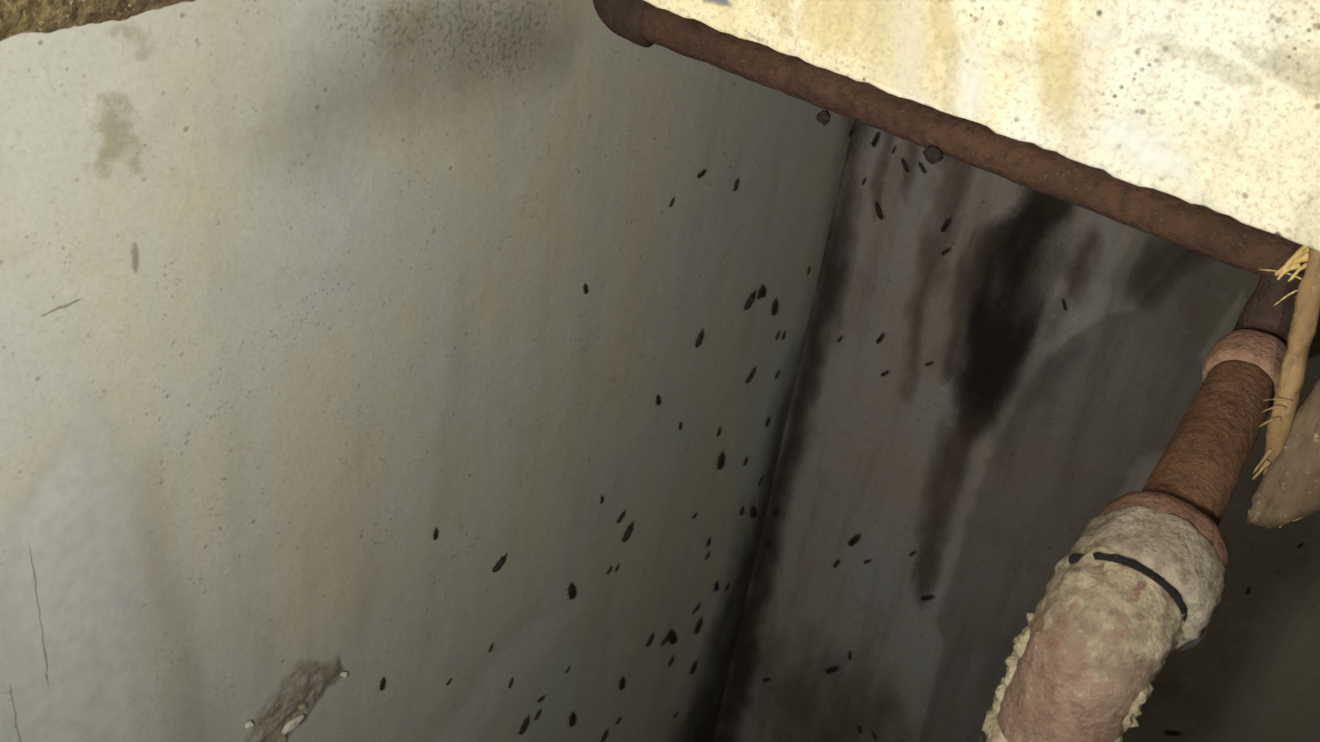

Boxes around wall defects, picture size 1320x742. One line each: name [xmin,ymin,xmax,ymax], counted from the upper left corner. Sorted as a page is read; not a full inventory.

damp [689,120,864,742]
damp [918,191,1072,592]
spalling [244,660,348,742]
damp [982,545,1188,742]